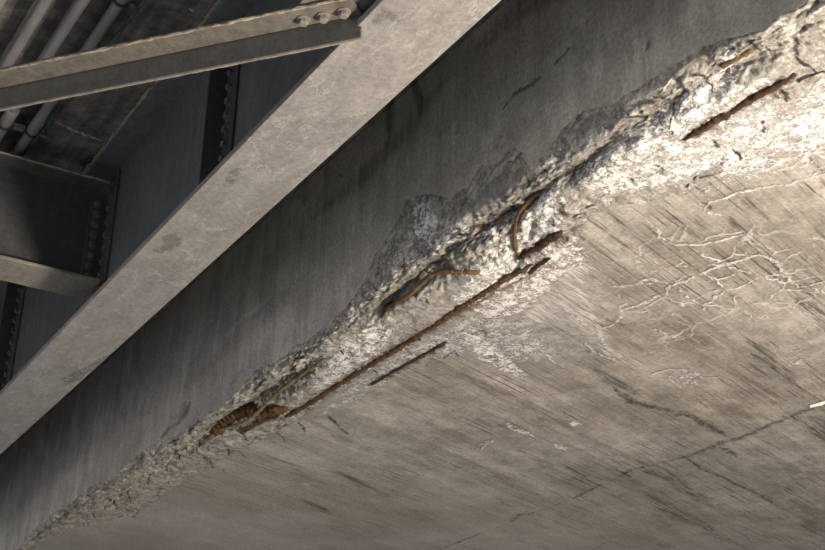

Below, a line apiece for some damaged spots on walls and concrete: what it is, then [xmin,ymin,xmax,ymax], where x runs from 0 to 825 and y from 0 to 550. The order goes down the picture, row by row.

crack [795,40,816,72]
corrosion [223,416,269,434]
spalling [34,248,566,540]
corrosion [325,270,539,397]
damp [310,44,825,415]
spalling [358,0,825,332]
crack [439,389,825,550]
crack [564,227,823,389]
crack [704,172,825,216]